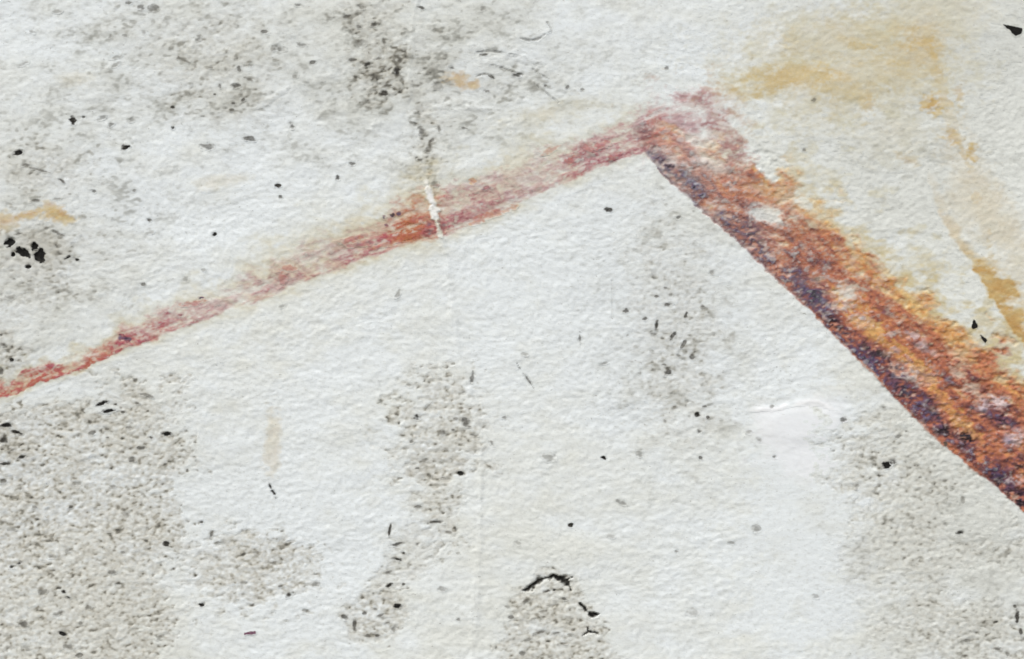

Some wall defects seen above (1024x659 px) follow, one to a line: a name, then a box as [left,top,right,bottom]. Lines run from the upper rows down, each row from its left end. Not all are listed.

damp [313,0,585,169]
damp [632,0,1024,198]
rust [0,22,1024,514]
damp [0,341,516,659]
damp [487,561,627,659]